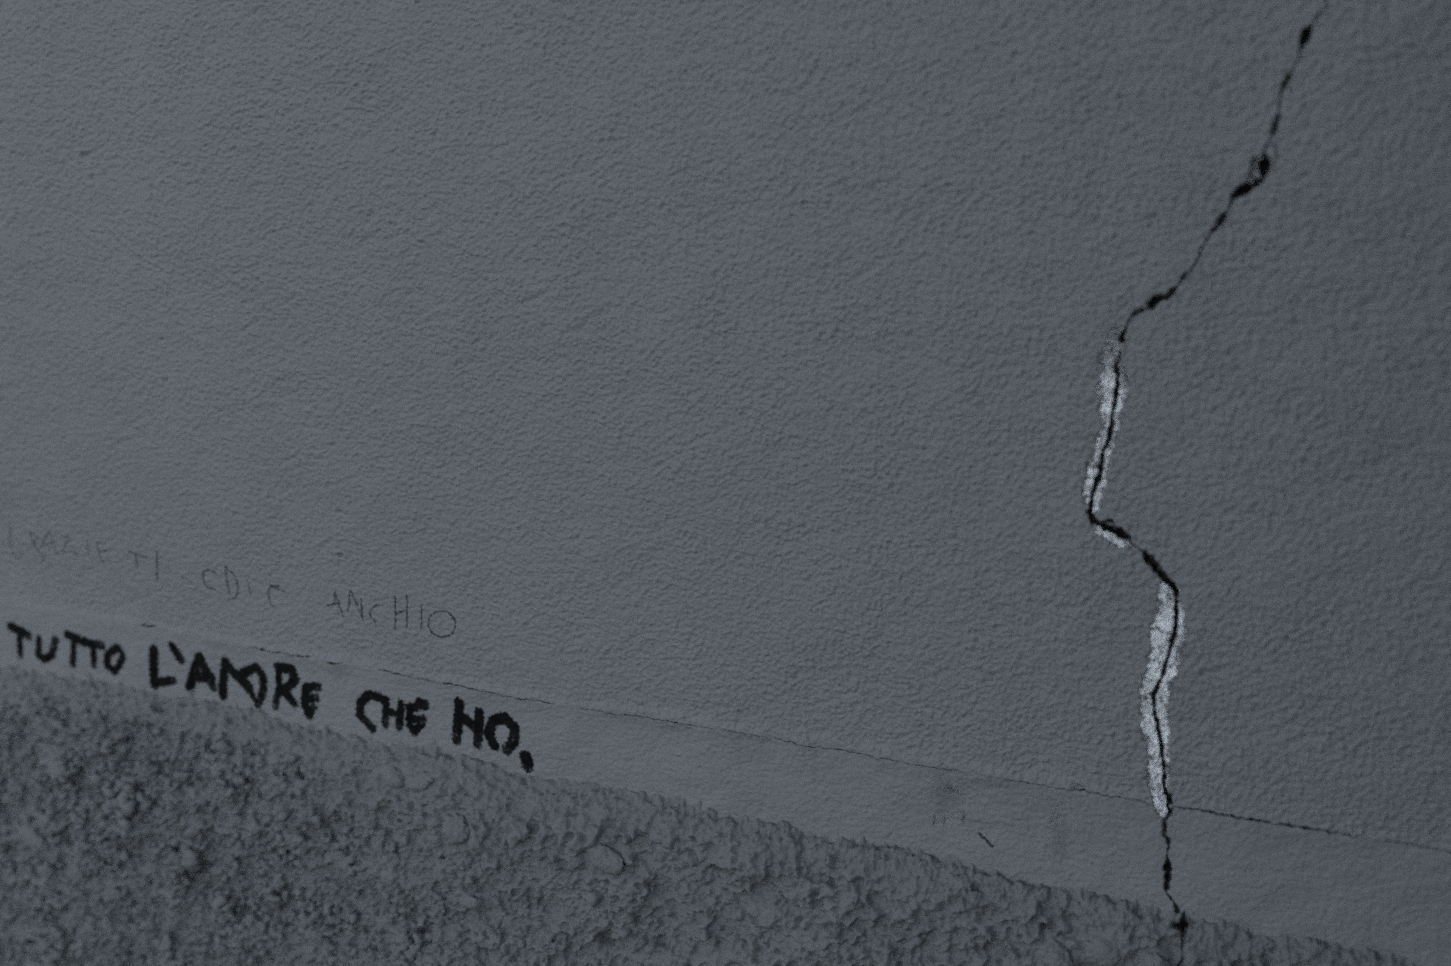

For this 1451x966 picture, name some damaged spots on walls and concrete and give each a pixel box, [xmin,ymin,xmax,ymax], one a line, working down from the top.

crack [249,647,339,665]
crack [376,0,1451,966]